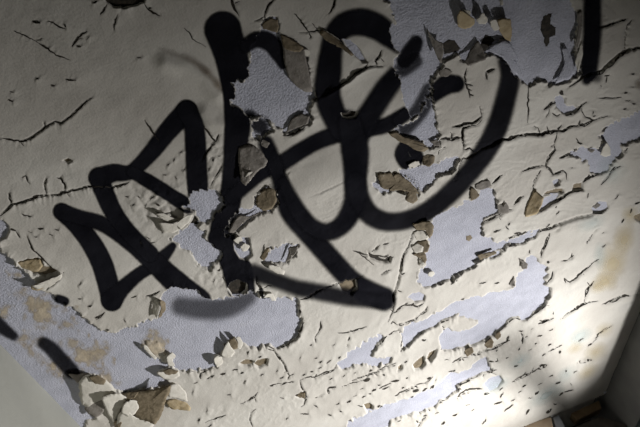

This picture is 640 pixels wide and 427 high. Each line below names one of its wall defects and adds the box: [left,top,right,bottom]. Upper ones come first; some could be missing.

crack [2,98,92,146]
crack [14,21,87,60]
peeling [230,16,316,186]
peeling [373,0,583,204]
crack [438,19,640,222]
crack [0,176,129,290]
peeling [145,189,225,281]
peeling [224,187,278,259]
peeling [408,180,550,301]
crack [509,225,555,256]
peeling [0,248,302,427]
peeling [303,250,550,427]